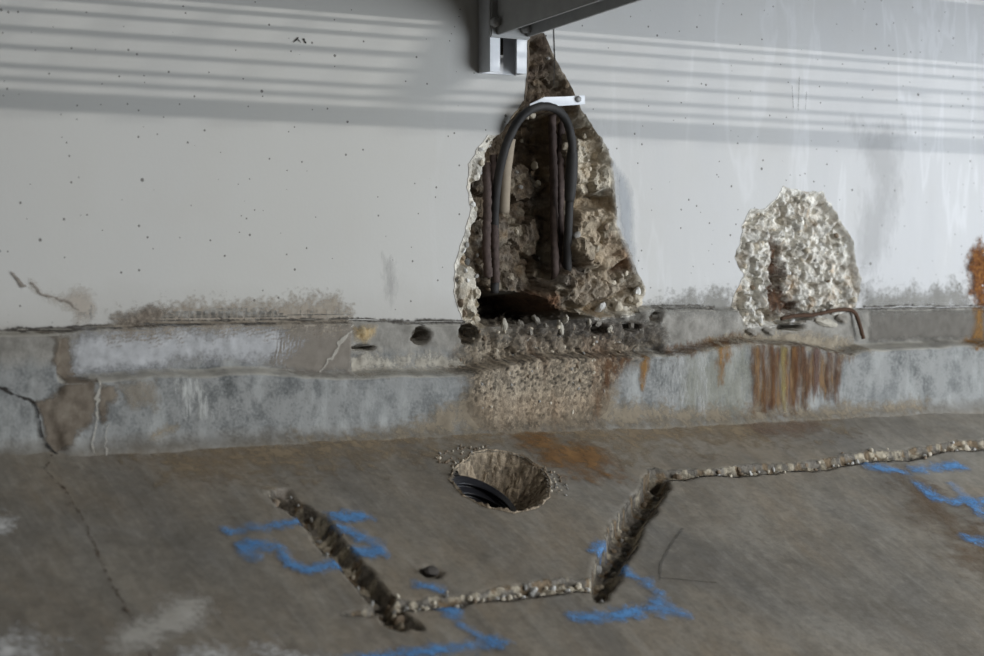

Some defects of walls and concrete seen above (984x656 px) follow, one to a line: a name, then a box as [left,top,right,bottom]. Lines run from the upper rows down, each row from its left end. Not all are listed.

spalling [452,33,669,434]
spalling [731,186,862,336]
rust [966,239,984,349]
rust [665,334,852,435]
crack [0,387,151,655]